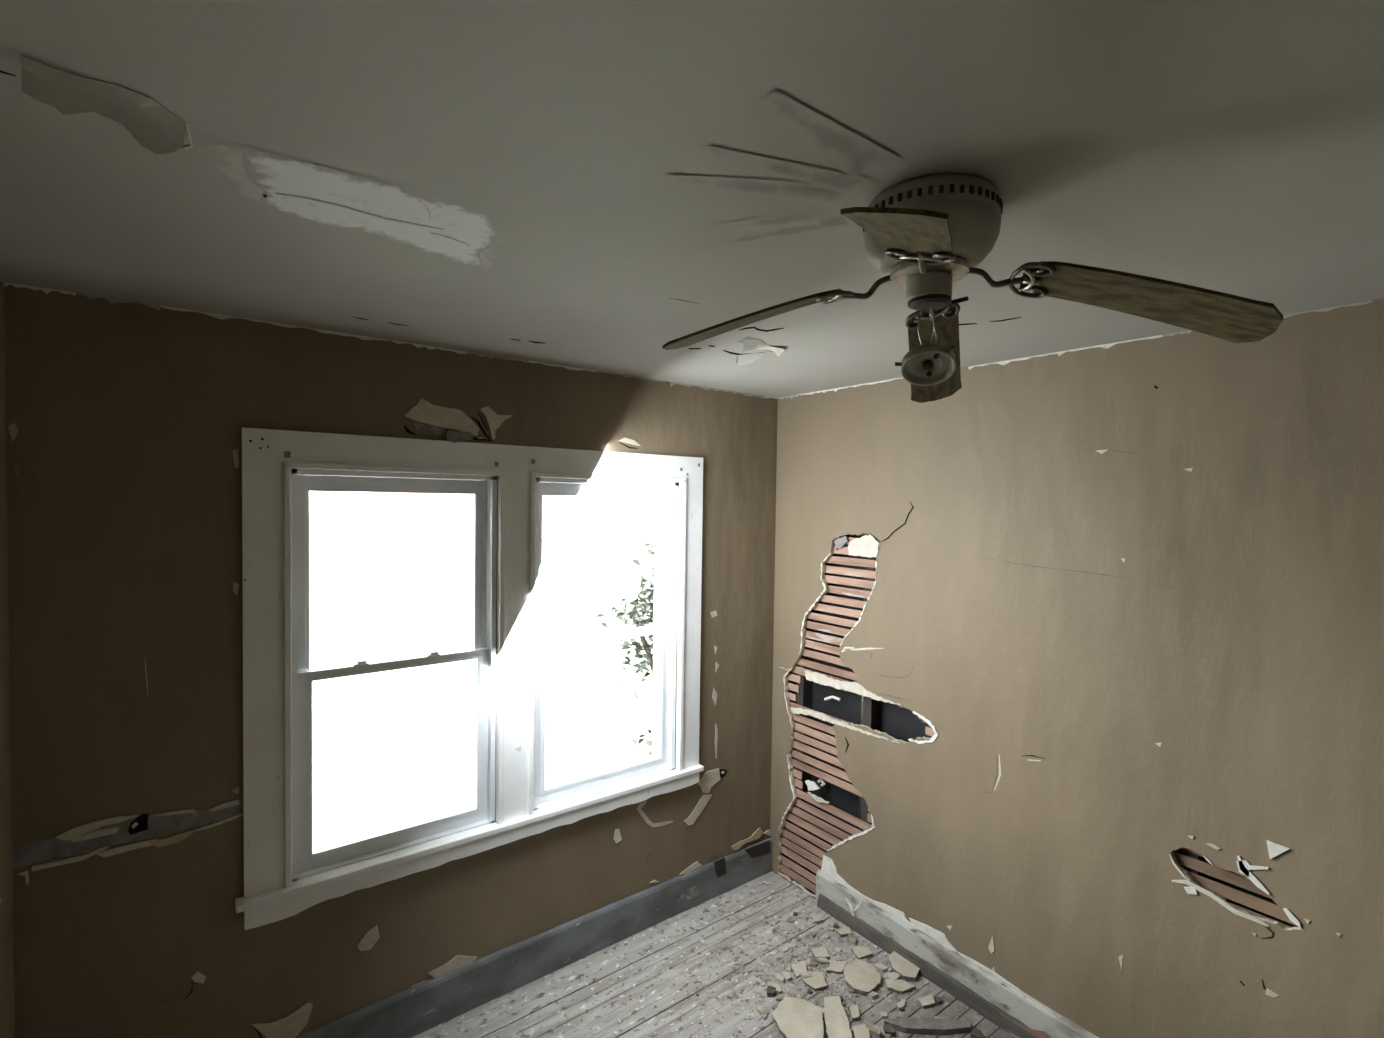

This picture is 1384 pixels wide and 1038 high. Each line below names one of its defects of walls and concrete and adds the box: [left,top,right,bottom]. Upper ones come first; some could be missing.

peeling [0,55,193,154]
peeling [4,282,903,400]
peeling [960,330,1192,370]
flaking render [404,398,513,443]
flaking render [636,724,727,828]
spalling [679,533,1020,991]
peeling [12,786,243,886]
spalling [1169,836,1310,939]
flaking render [251,1002,313,1038]